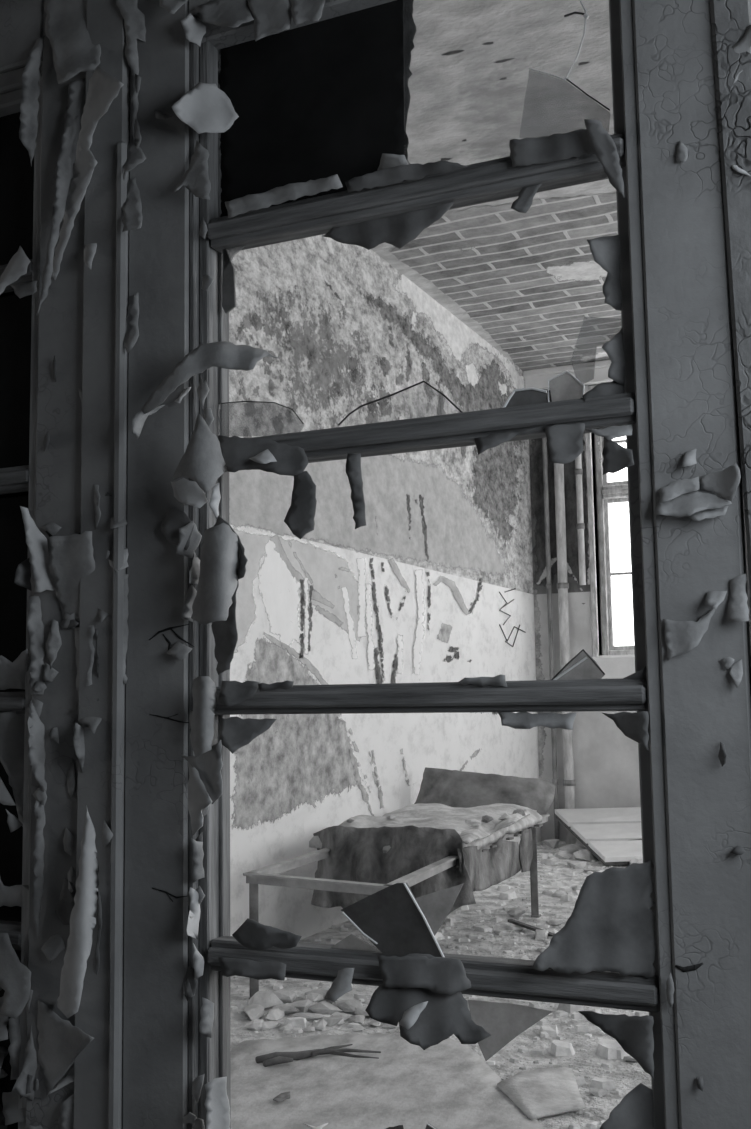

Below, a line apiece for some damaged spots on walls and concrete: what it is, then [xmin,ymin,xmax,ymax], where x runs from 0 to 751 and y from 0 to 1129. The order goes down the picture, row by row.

peeling [159,0,334,47]
peeling [654,449,741,521]
flaking render [132,305,510,1050]
peeling [623,666,646,680]
peeling [603,711,649,750]
peeling [0,485,129,1129]
peeling [578,1011,654,1129]